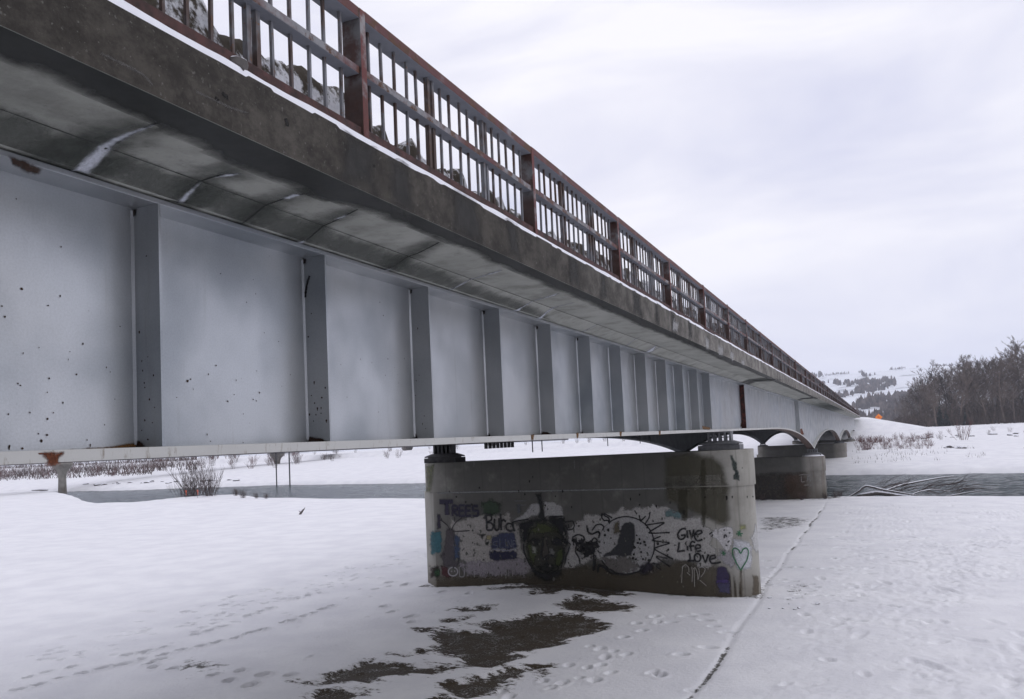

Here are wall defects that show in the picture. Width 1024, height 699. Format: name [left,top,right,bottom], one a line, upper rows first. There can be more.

rust [10,157,41,174]
rust [38,433,64,466]
water stain [426,454,739,524]
water stain [436,562,742,597]